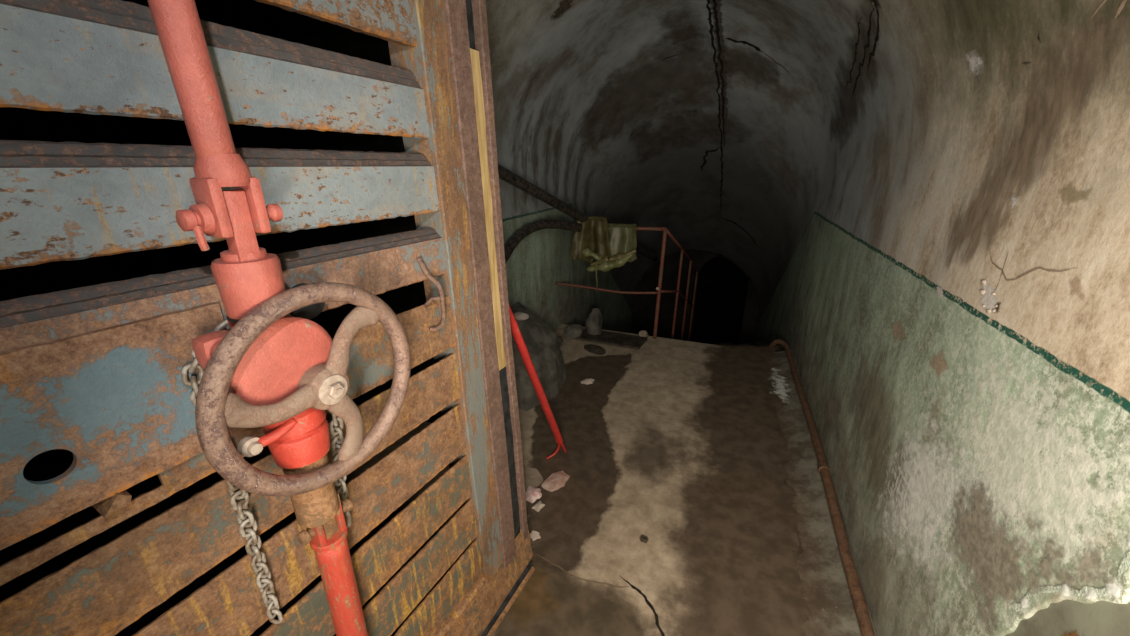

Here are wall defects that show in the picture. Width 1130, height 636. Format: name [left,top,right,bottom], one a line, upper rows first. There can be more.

water stain [513,12,771,205]
crack [700,0,790,246]
crack [846,0,879,101]
water stain [948,0,1129,265]
water stain [492,354,645,636]
crack [534,553,665,636]
water stain [666,345,810,636]
peeling [953,483,1130,632]